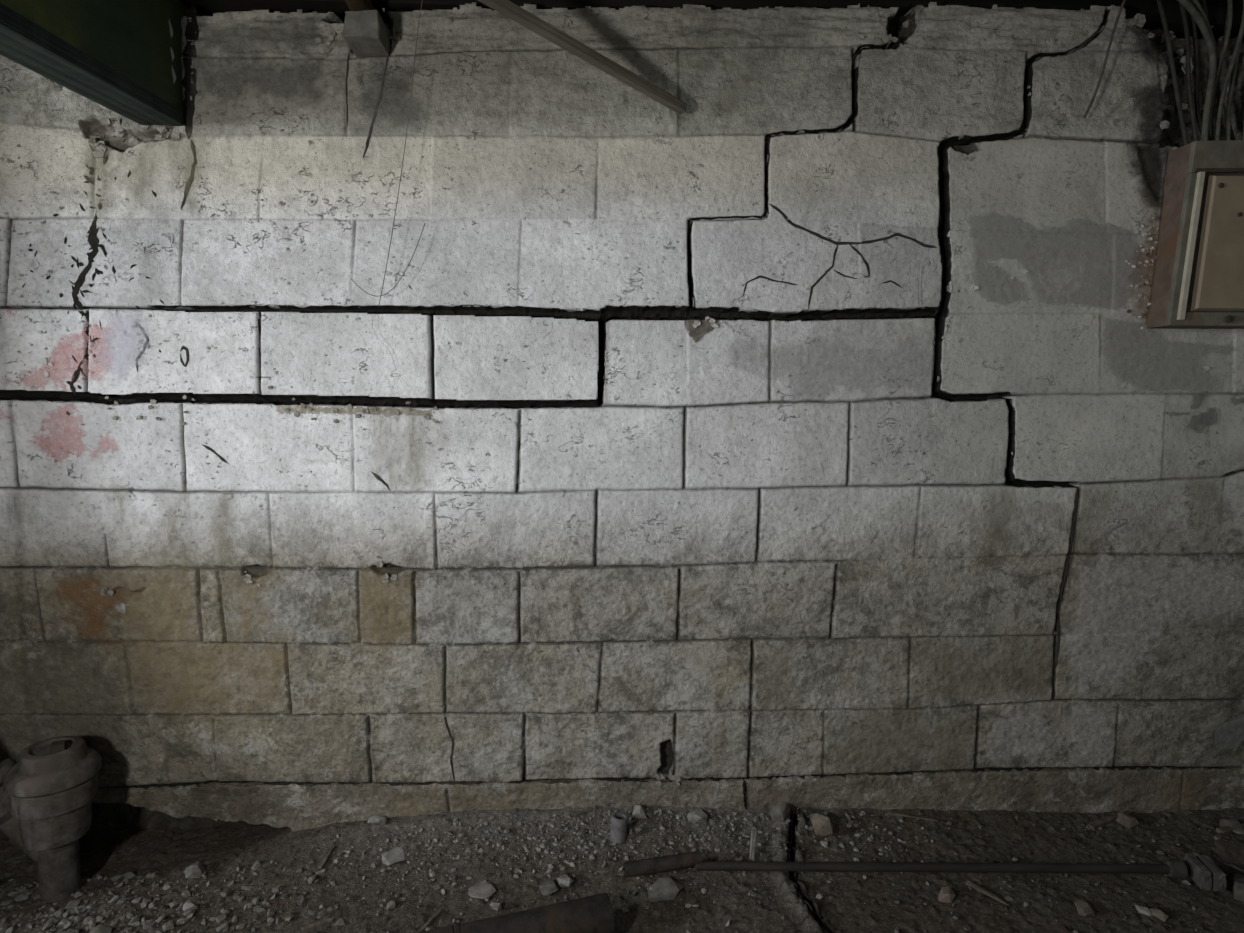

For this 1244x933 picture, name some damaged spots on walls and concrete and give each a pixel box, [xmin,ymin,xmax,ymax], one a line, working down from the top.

spalling [79,115,181,158]
crack [0,3,1141,699]
crack [126,713,1226,809]
crack [780,807,835,933]